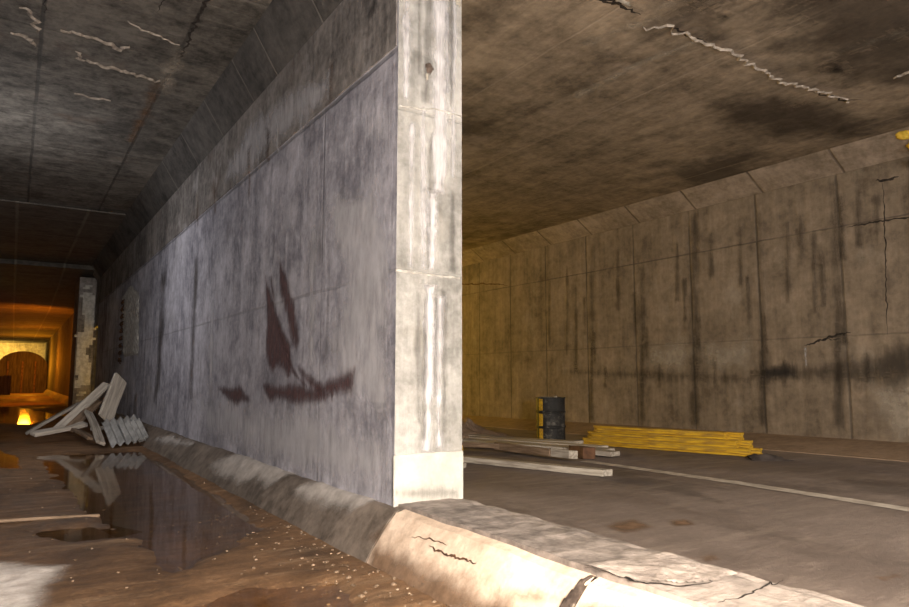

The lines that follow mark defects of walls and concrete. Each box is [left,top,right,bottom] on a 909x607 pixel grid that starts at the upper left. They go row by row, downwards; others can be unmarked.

crack [10,0,210,83]
crack [599,0,860,103]
crack [74,93,111,101]
crack [850,176,909,333]
leakage [761,326,909,428]
crack [416,536,476,564]
crack [720,580,783,602]